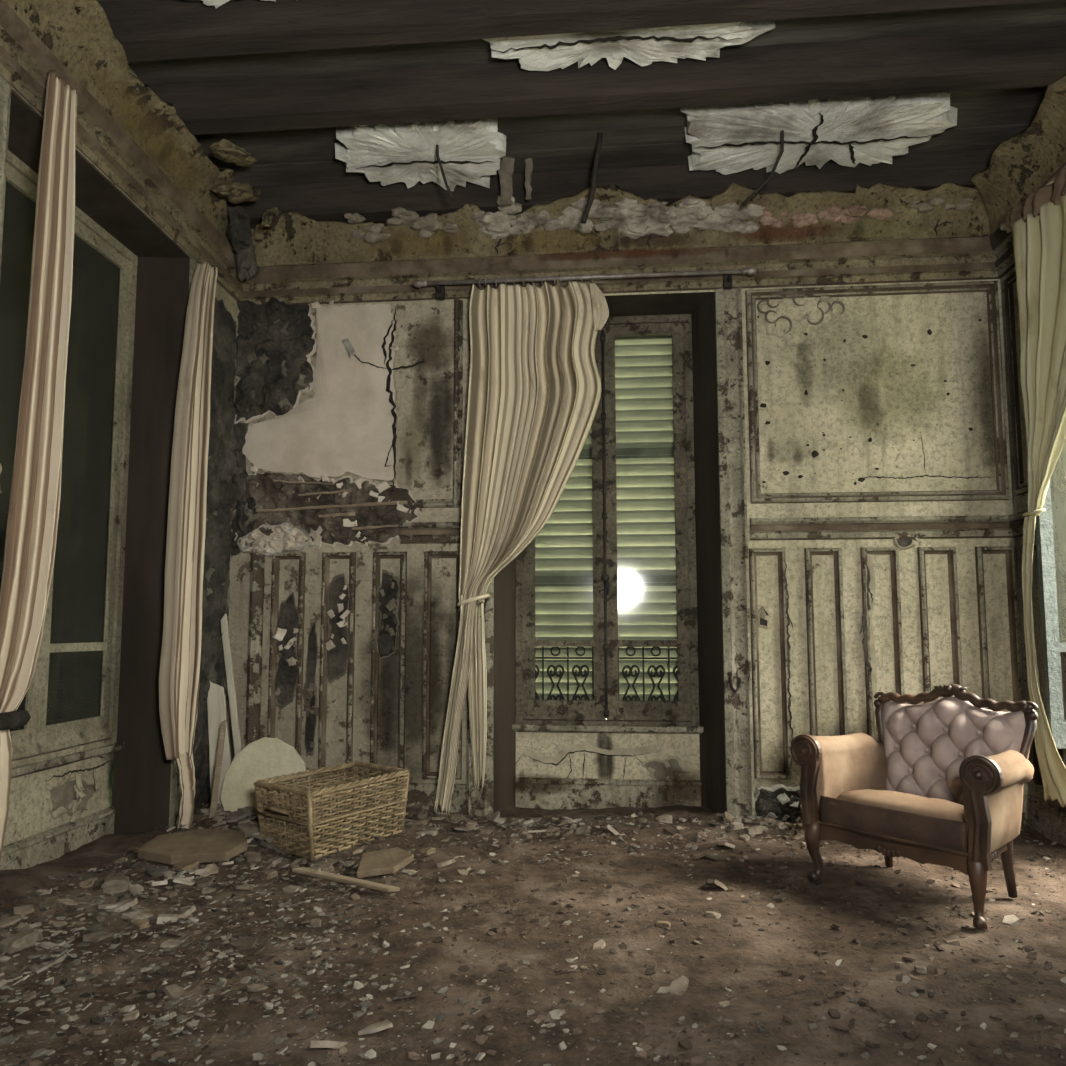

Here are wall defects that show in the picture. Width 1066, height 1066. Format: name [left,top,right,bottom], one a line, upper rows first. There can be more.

flaking render [202,0,230,8]
flaking render [483,20,775,71]
flaking render [680,92,957,175]
flaking render [335,118,973,244]
leakage [411,323,447,365]
crack [354,305,425,492]
leakage [425,380,451,465]
flaking render [193,297,422,809]